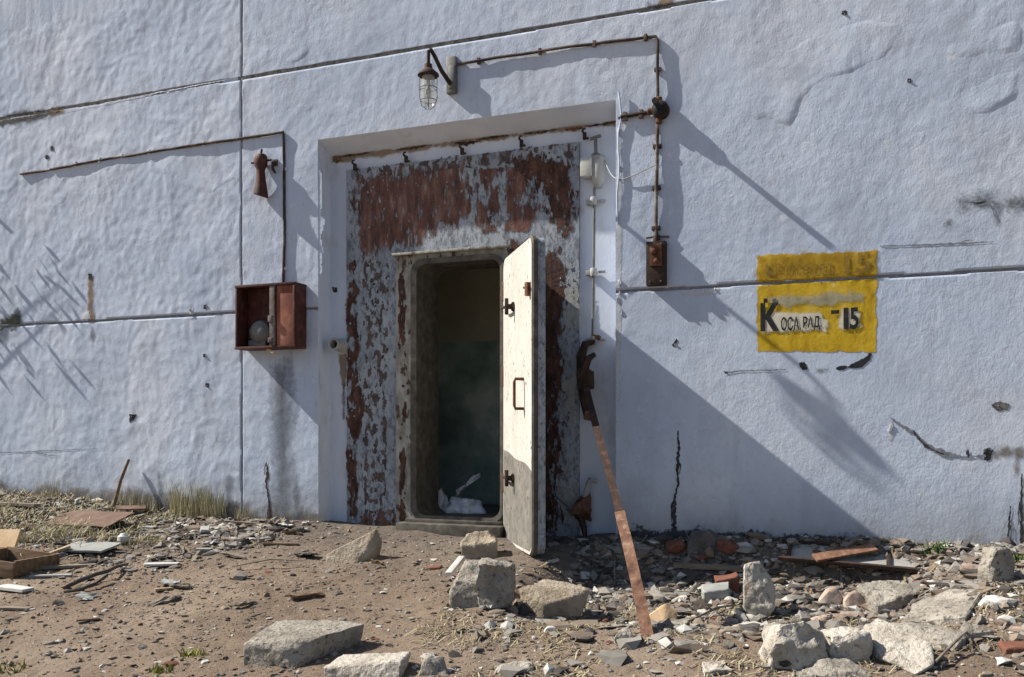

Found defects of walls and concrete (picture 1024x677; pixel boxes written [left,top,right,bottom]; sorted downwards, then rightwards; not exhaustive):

rust [81,273,95,340]
peeling [332,140,582,551]
crack [670,431,681,533]
crack [890,417,995,459]